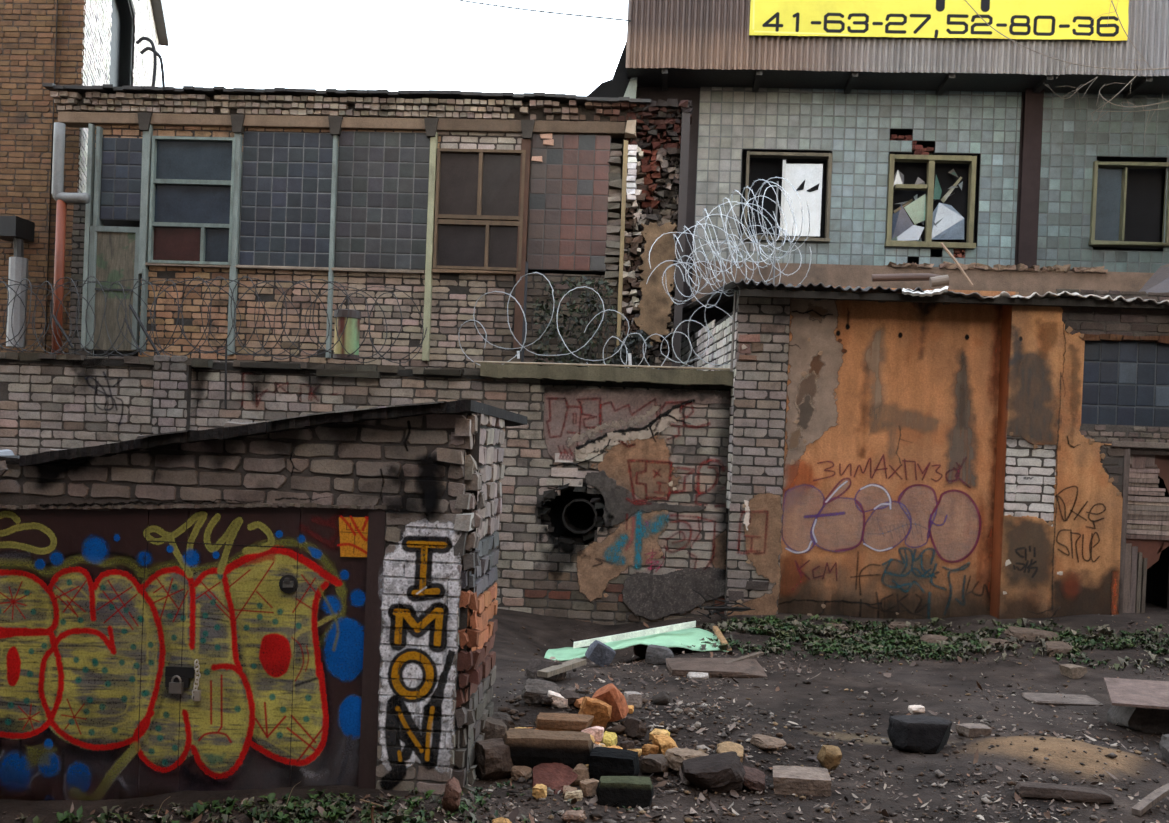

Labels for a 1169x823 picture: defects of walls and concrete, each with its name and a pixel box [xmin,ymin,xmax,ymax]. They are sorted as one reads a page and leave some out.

flaking render [890,134,934,155]
spalling [1056,289,1169,341]
spalling [437,418,475,556]
crack [549,399,695,470]
flaking render [537,299,847,620]
water stain [862,329,938,455]
water stain [947,352,977,487]
spalling [1079,424,1169,496]